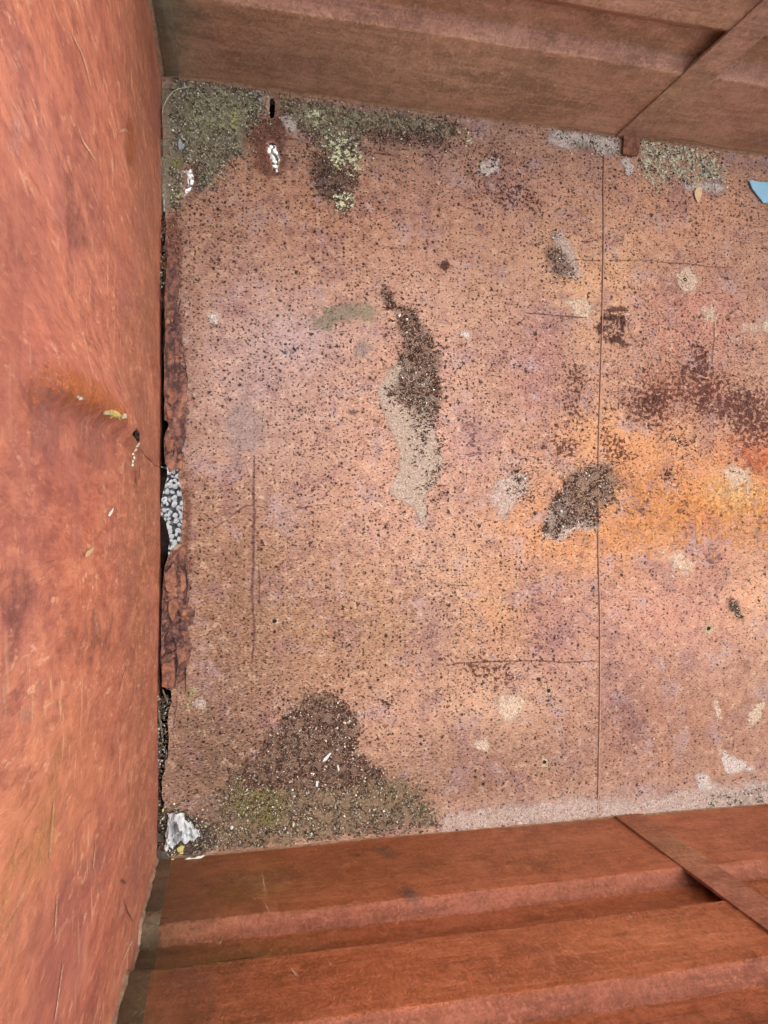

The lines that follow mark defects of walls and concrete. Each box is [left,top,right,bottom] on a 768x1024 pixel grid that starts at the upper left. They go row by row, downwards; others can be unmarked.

damp [280,116,296,134]
damp [685,182,724,194]
peeling [166,388,177,419]
rust [541,319,768,609]
peeling [164,564,186,621]
peeling [162,648,187,688]